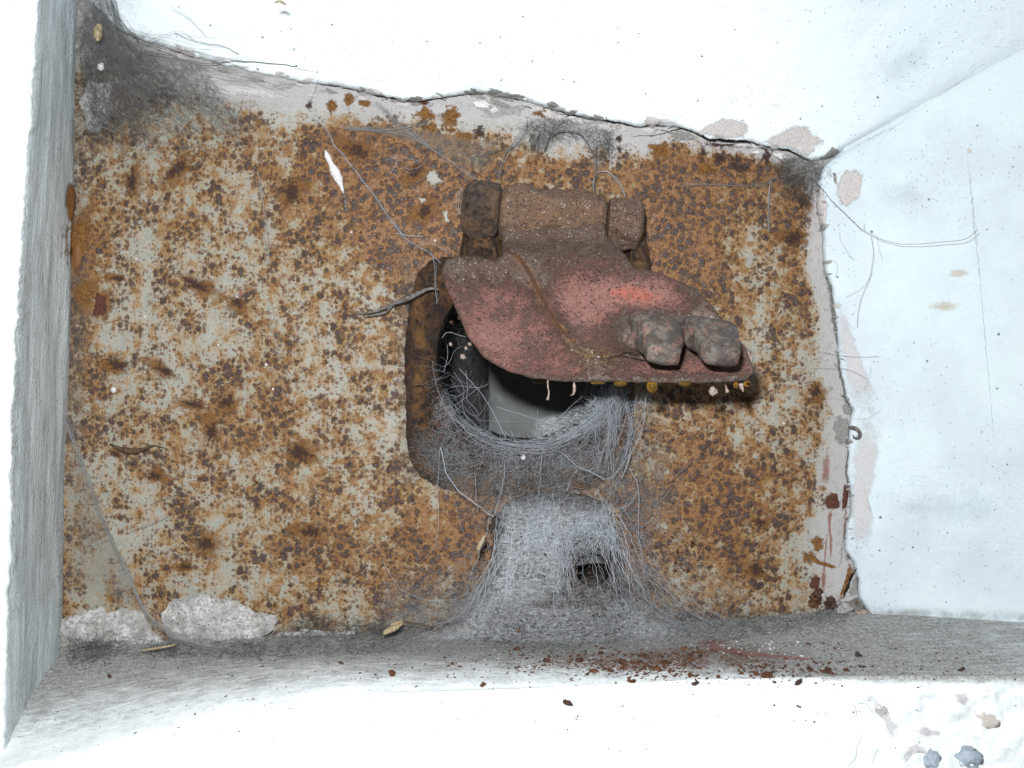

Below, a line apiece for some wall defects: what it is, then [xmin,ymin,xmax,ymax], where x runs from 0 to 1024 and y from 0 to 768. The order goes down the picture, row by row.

rust [326,93,371,115]
crack [320,84,465,102]
rust [412,101,485,146]
flaking render [464,88,629,144]
crack [481,106,809,161]
rust [648,140,670,159]
spalling [642,116,840,159]
spalling [812,169,862,234]
rust [179,274,246,312]
rust [102,355,176,379]
rust [172,394,242,445]
rust [803,485,855,599]